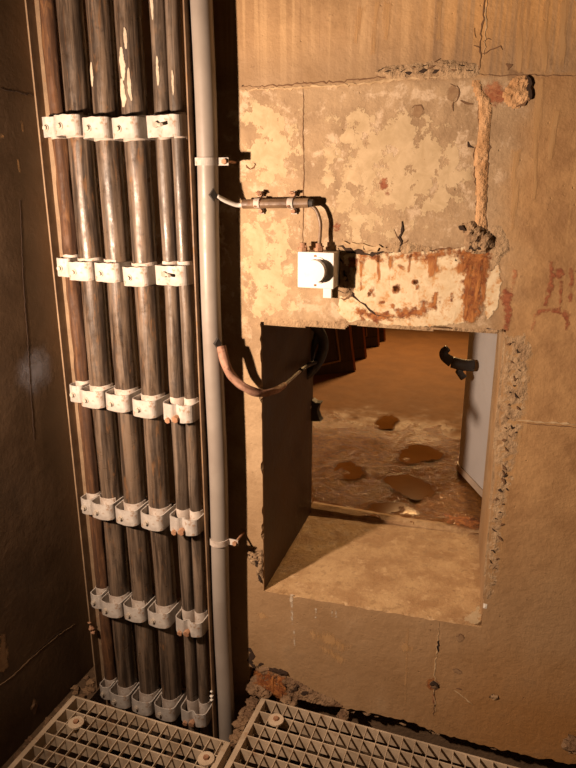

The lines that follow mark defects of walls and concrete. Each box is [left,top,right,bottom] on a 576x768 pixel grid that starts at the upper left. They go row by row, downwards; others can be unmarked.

crack [474,0,576,77]
crack [241,76,456,238]
rust [348,249,491,324]
peeling [240,59,534,609]
spalling [255,666,352,722]
crack [432,627,440,715]